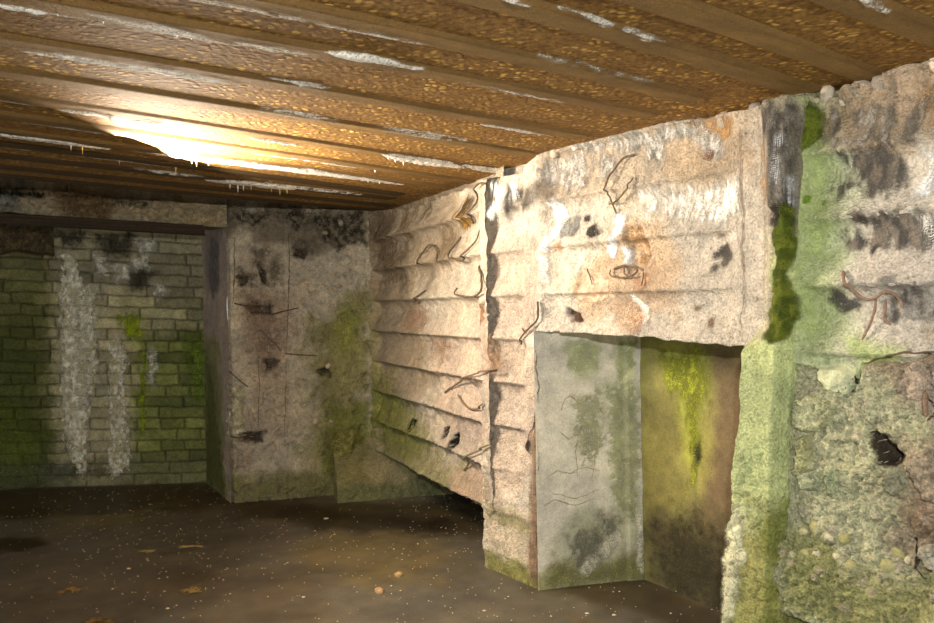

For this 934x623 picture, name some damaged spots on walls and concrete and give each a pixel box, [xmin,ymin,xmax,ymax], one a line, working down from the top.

leakage [0,4,76,18]
leakage [92,15,308,55]
leakage [558,6,654,41]
leakage [325,51,424,70]
leakage [382,154,524,220]
leakage [761,101,800,227]
leakage [823,92,934,199]
corrosion [451,197,474,230]
leakage [836,208,934,254]
leakage [710,243,732,272]
leakage [56,231,167,480]
spalling [773,354,934,623]